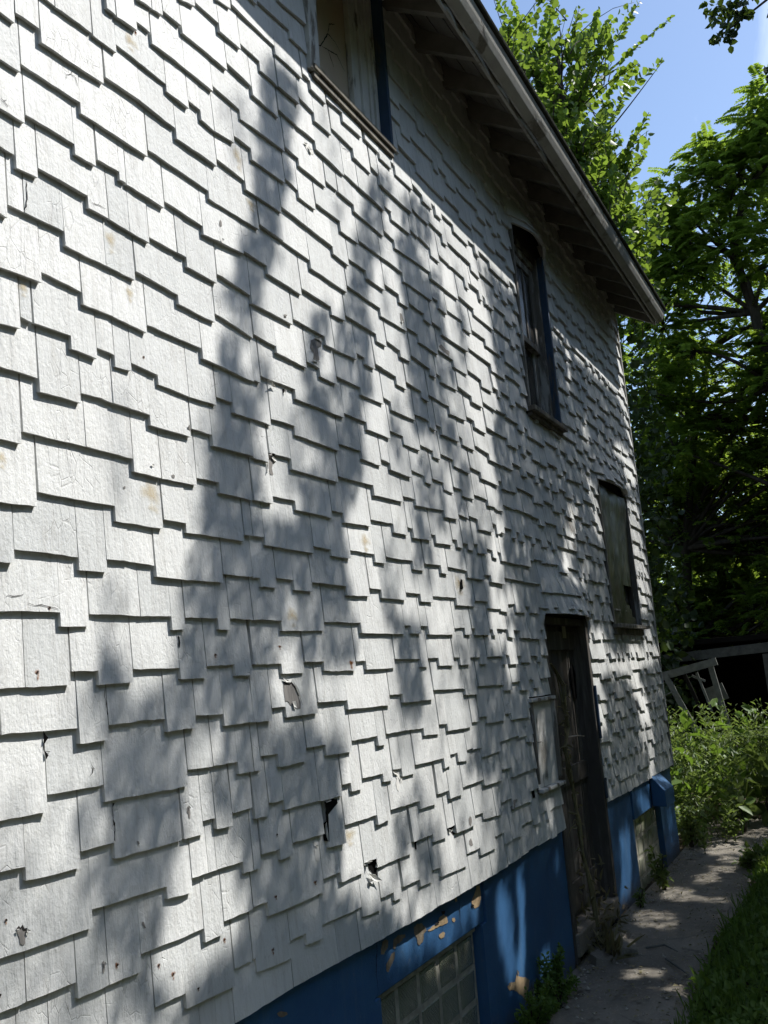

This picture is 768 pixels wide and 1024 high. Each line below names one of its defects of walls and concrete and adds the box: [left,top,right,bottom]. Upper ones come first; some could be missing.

peeling [310,337,323,363]
peeling [283,678,303,709]
peeling [472,885,481,908]
peeling [17,924,31,945]
peeling [381,911,455,972]
spalling [507,970,530,999]